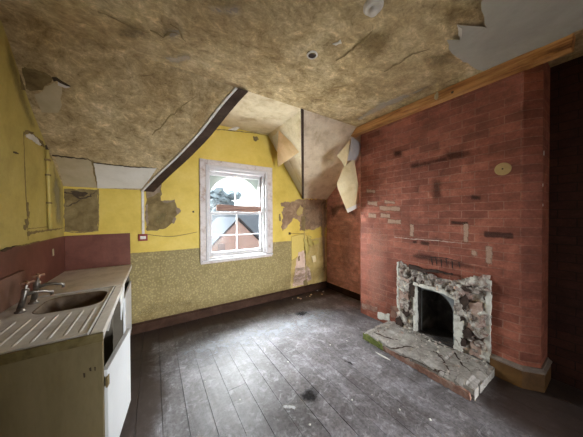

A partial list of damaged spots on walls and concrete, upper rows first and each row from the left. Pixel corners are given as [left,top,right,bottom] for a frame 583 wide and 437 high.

crack [336,26,373,61]
peeling [34,82,70,113]
crack [152,96,196,135]
flaking render [63,189,99,233]
flaking render [145,184,181,231]
peeling [279,199,327,287]
spalling [408,264,454,275]
flaking render [459,286,484,347]
crack [374,332,474,374]